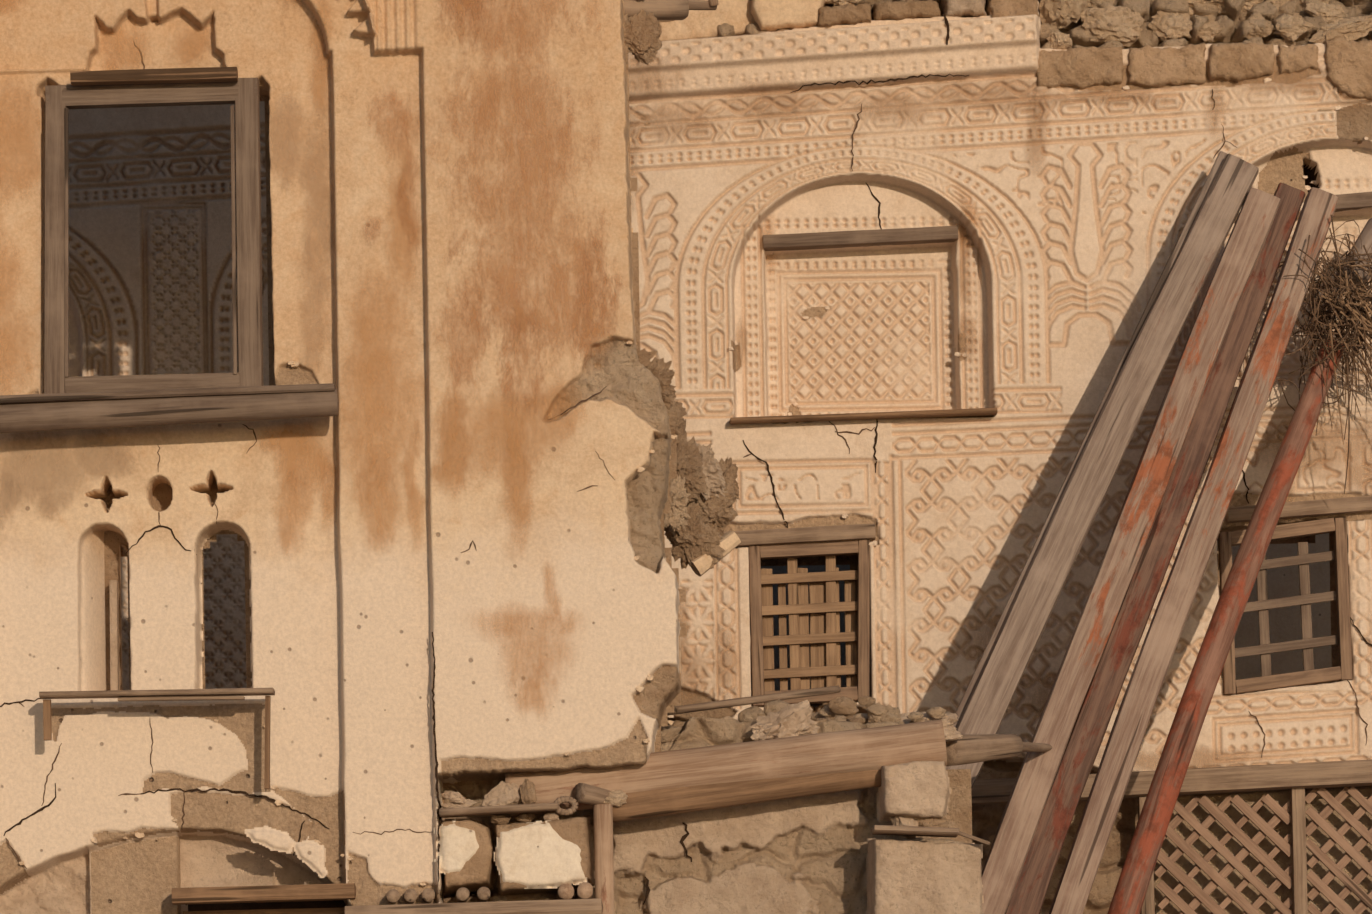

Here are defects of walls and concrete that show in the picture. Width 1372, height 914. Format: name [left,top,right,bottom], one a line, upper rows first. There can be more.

crack [790,14,969,229]
crack [126,512,197,555]
spalling [545,338,880,577]
crack [743,440,788,528]
crack [772,419,878,473]
crack [4,743,62,869]
crack [118,632,442,882]
peeling [51,703,587,906]
flaking render [972,804,1007,873]
flaking render [977,759,1023,780]
flaking render [1040,800,1087,914]
flaking render [1083,798,1138,914]